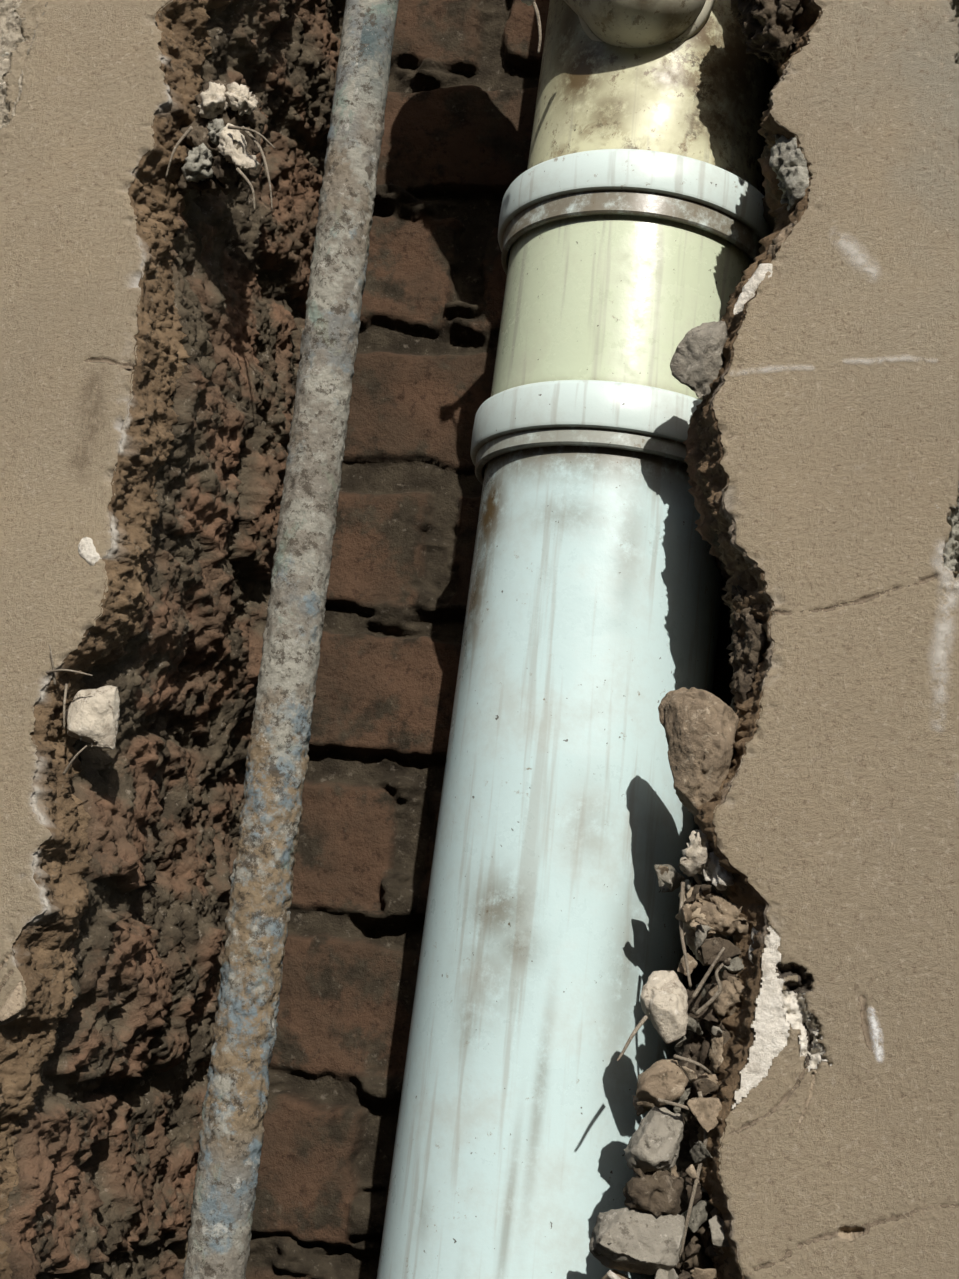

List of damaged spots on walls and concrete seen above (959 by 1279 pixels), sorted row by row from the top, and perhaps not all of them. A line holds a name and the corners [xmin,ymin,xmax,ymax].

crack [0,0,48,129]
crack [951,0,959,64]
crack [772,482,959,615]
spalling [0,0,231,1279]
spalling [678,0,832,1279]
crack [754,1204,959,1271]